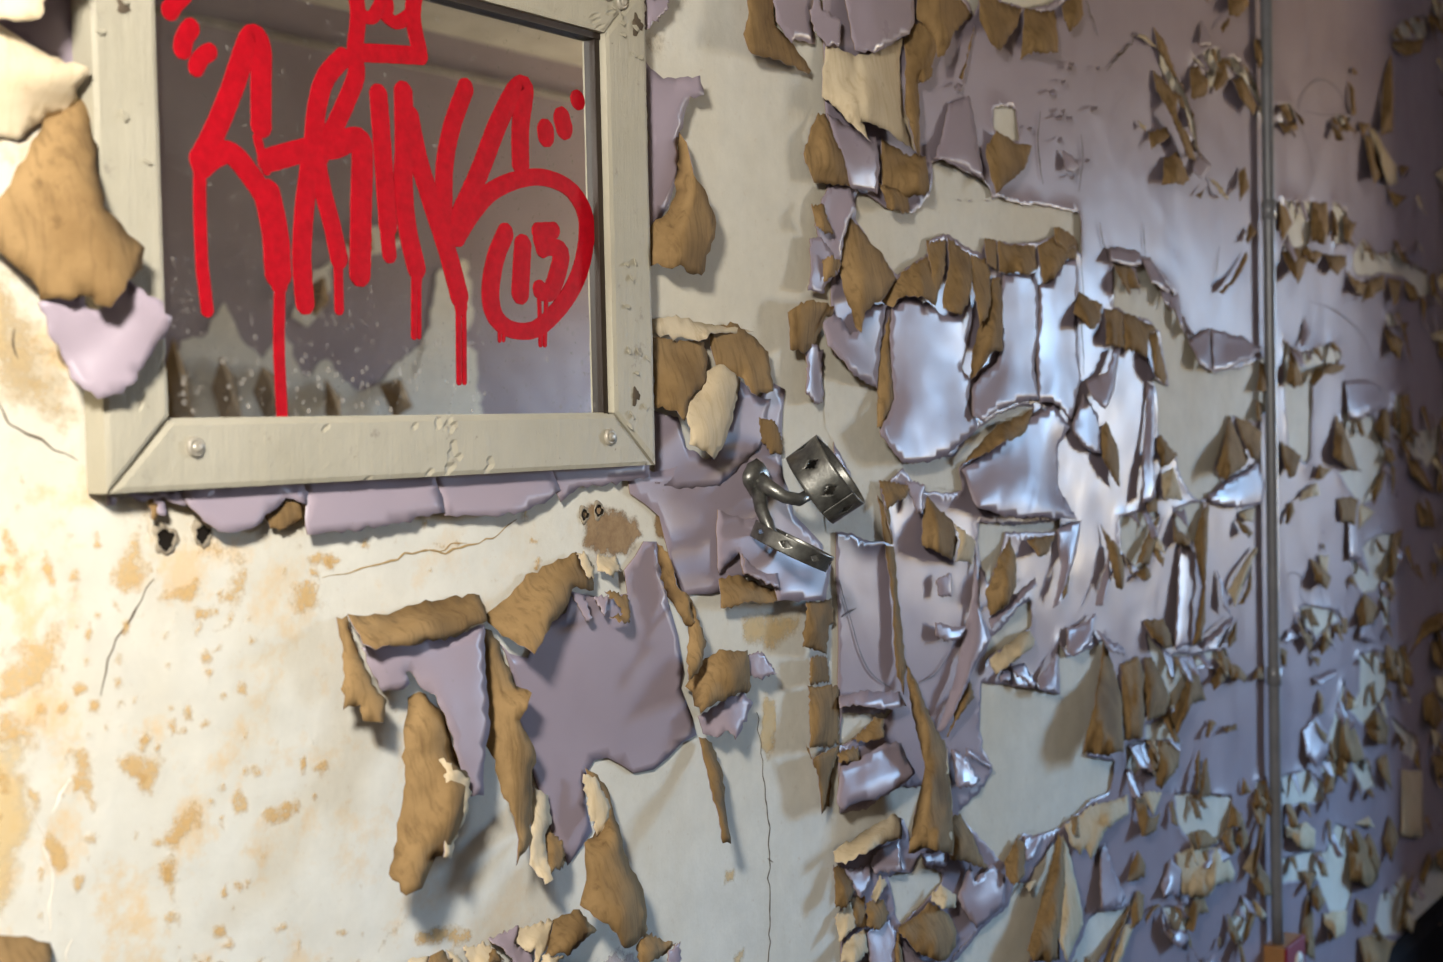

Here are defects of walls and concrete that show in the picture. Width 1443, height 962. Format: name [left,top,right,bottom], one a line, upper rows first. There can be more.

peeling [0,0,172,399]
peeling [646,62,716,276]
crack [11,327,19,358]
crack [0,405,78,461]
peeling [716,0,1443,962]
water stain [0,640,55,901]
water stain [40,836,84,889]
crack [100,579,154,696]
water stain [121,736,158,790]
water stain [297,553,339,609]
peeling [336,551,631,896]
peeling [407,768,682,962]